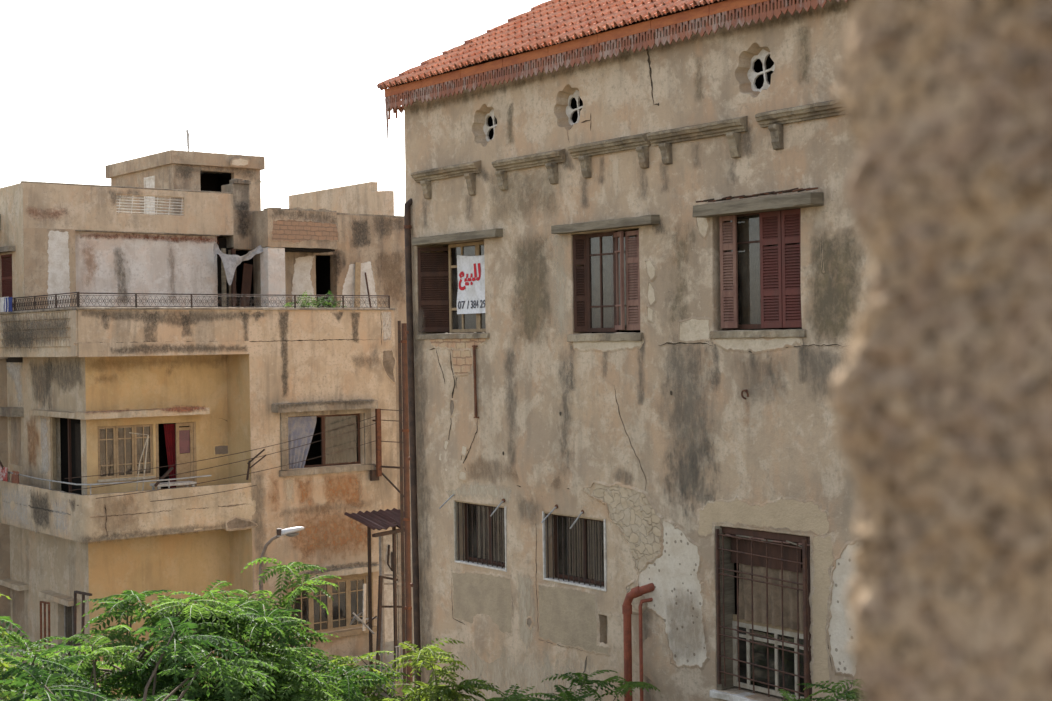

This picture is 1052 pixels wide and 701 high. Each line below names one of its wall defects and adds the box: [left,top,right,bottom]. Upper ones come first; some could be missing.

leakage [7,362,81,405]
leakage [86,251,264,353]
crack [429,347,478,471]
flaking render [428,332,488,378]
leakage [517,239,563,339]
crack [614,385,648,491]
leakage [668,350,709,494]
flaking render [582,480,710,670]
flaking render [826,538,858,680]